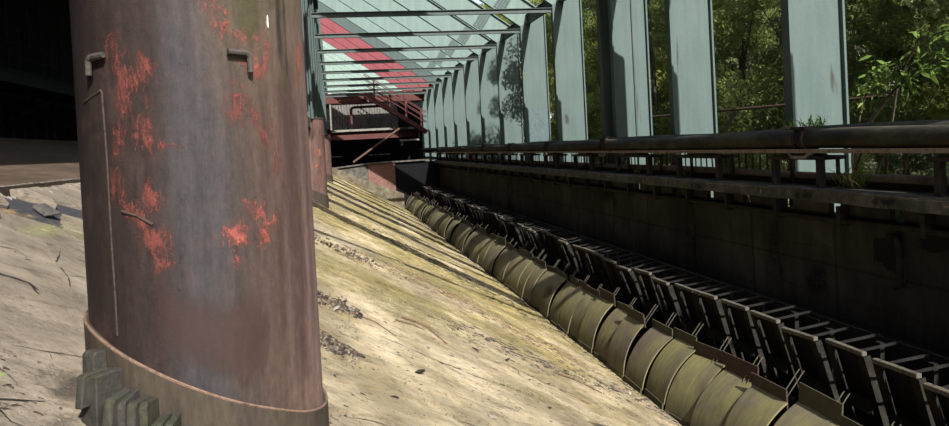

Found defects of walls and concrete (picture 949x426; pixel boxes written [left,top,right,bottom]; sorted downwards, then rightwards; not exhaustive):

crack [0,273,39,294]
crack [0,368,40,426]